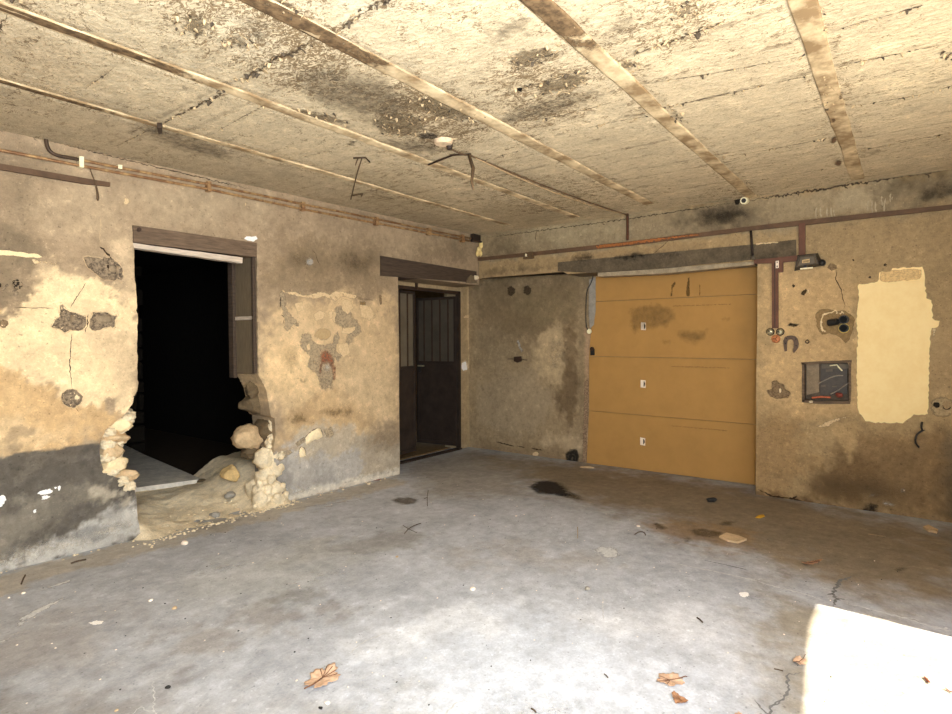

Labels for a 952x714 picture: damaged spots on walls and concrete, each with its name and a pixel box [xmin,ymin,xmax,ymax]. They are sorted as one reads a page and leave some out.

crack [337,0,390,35]
crack [34,43,313,187]
flaking render [83,247,125,283]
flaking render [51,304,119,334]
peeling [280,290,382,384]
flaking render [815,309,855,343]
flaking render [767,380,791,399]
spalling [100,408,137,491]
crack [659,559,952,632]
crack [755,672,801,714]